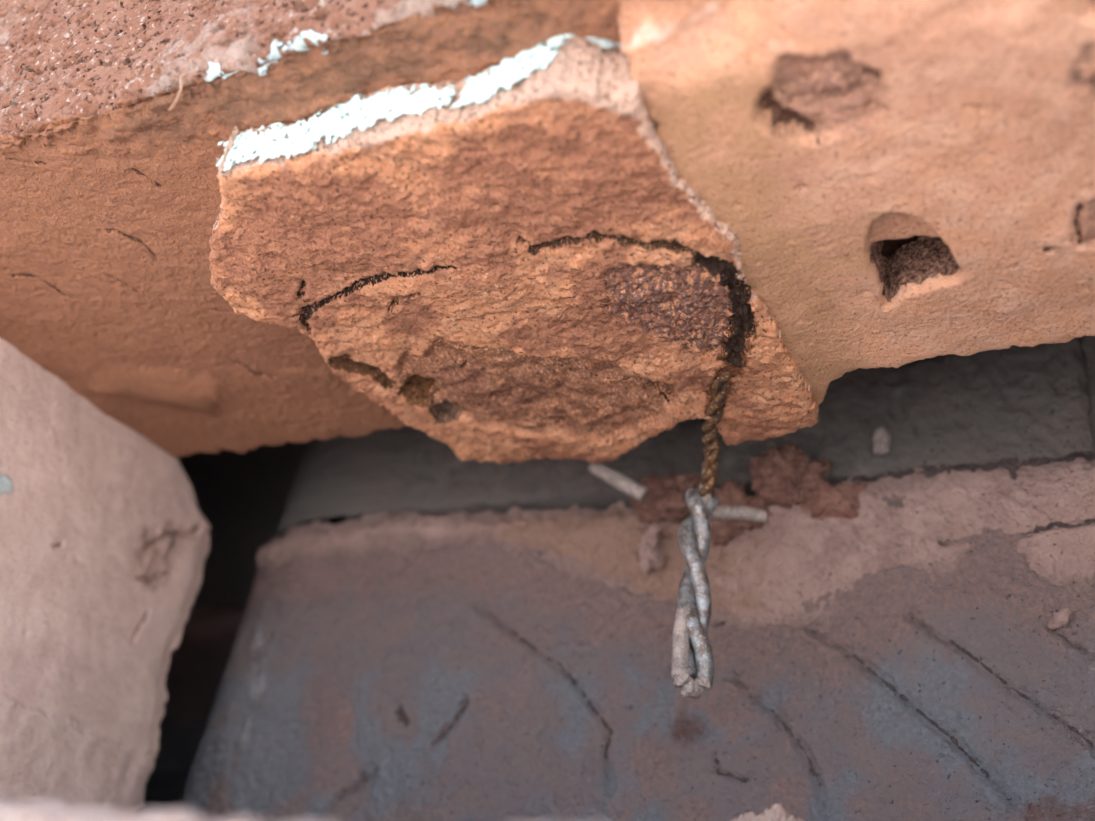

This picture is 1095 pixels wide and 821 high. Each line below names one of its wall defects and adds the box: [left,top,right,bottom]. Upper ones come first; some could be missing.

spalling [758,52,881,144]
spalling [1074,204,1095,244]
crack [293,265,457,335]
crack [518,230,756,367]
rust [705,316,756,417]